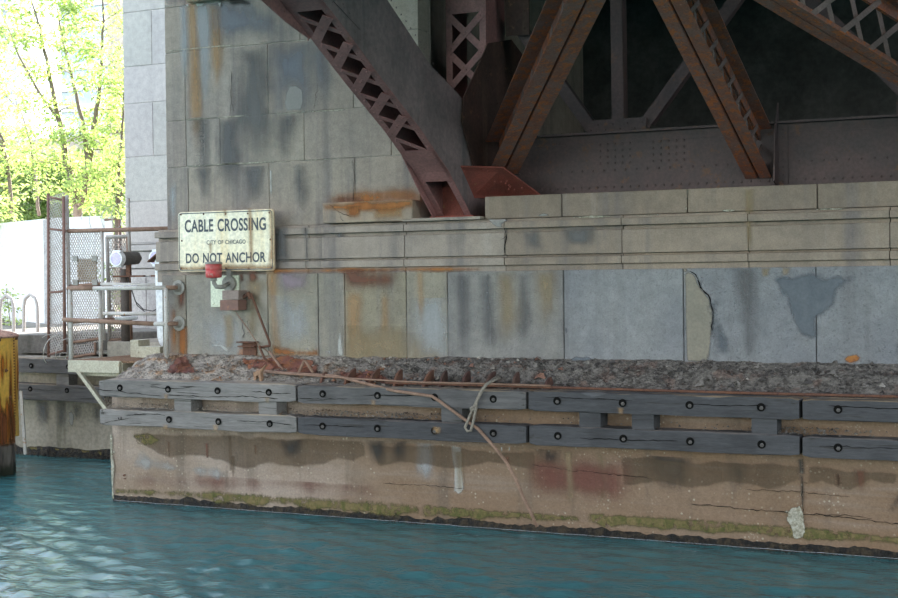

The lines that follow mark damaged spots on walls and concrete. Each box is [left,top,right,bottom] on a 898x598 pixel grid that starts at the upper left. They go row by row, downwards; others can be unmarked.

rust [189,5,200,117]
rust [328,192,415,217]
rust [238,348,317,376]
rust [323,268,391,285]
spalling [116,269,898,399]
leakage [777,274,845,337]
rust [0,354,19,446]